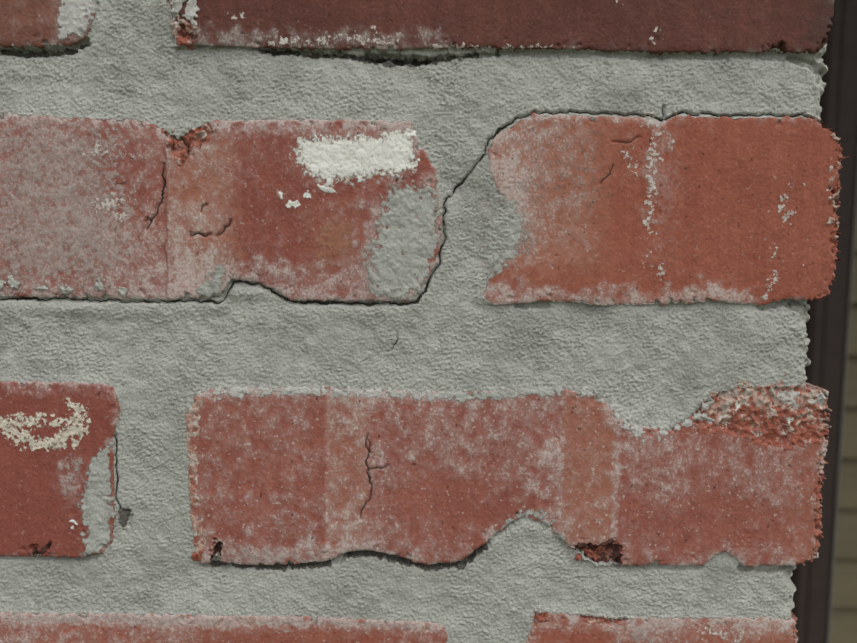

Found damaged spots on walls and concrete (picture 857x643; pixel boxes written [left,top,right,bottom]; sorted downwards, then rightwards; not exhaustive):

spalling [161,122,219,167]
crack [0,109,818,307]
damp [0,398,91,452]
spalling [651,374,832,451]
crack [360,436,388,519]
spalling [809,457,829,563]
spalling [573,539,623,565]